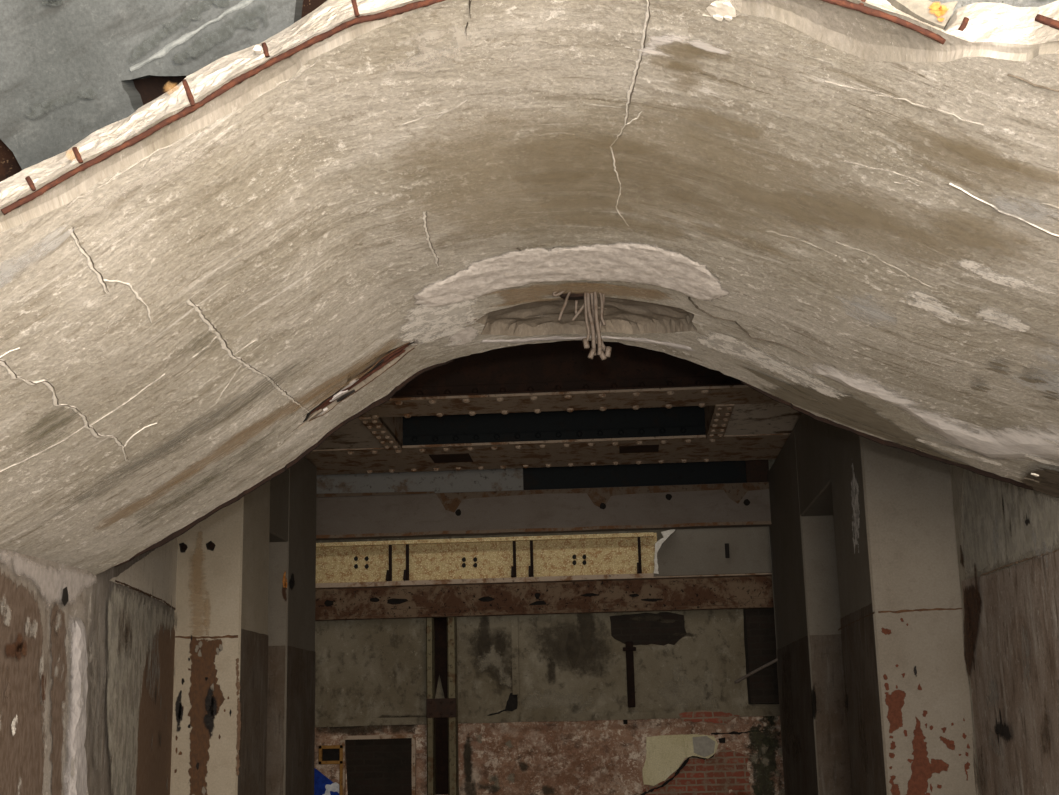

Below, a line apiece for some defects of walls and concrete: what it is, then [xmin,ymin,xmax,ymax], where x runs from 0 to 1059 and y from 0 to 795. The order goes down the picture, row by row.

spalling [694,0,1059,62]
spalling [0,0,450,233]
crack [610,0,650,226]
crack [1007,74,1059,92]
crack [949,183,1059,238]
crack [68,227,152,323]
crack [0,348,165,472]
crack [186,300,310,412]
spalling [292,336,424,432]
spalling [475,297,698,352]
flaking render [642,747,751,795]